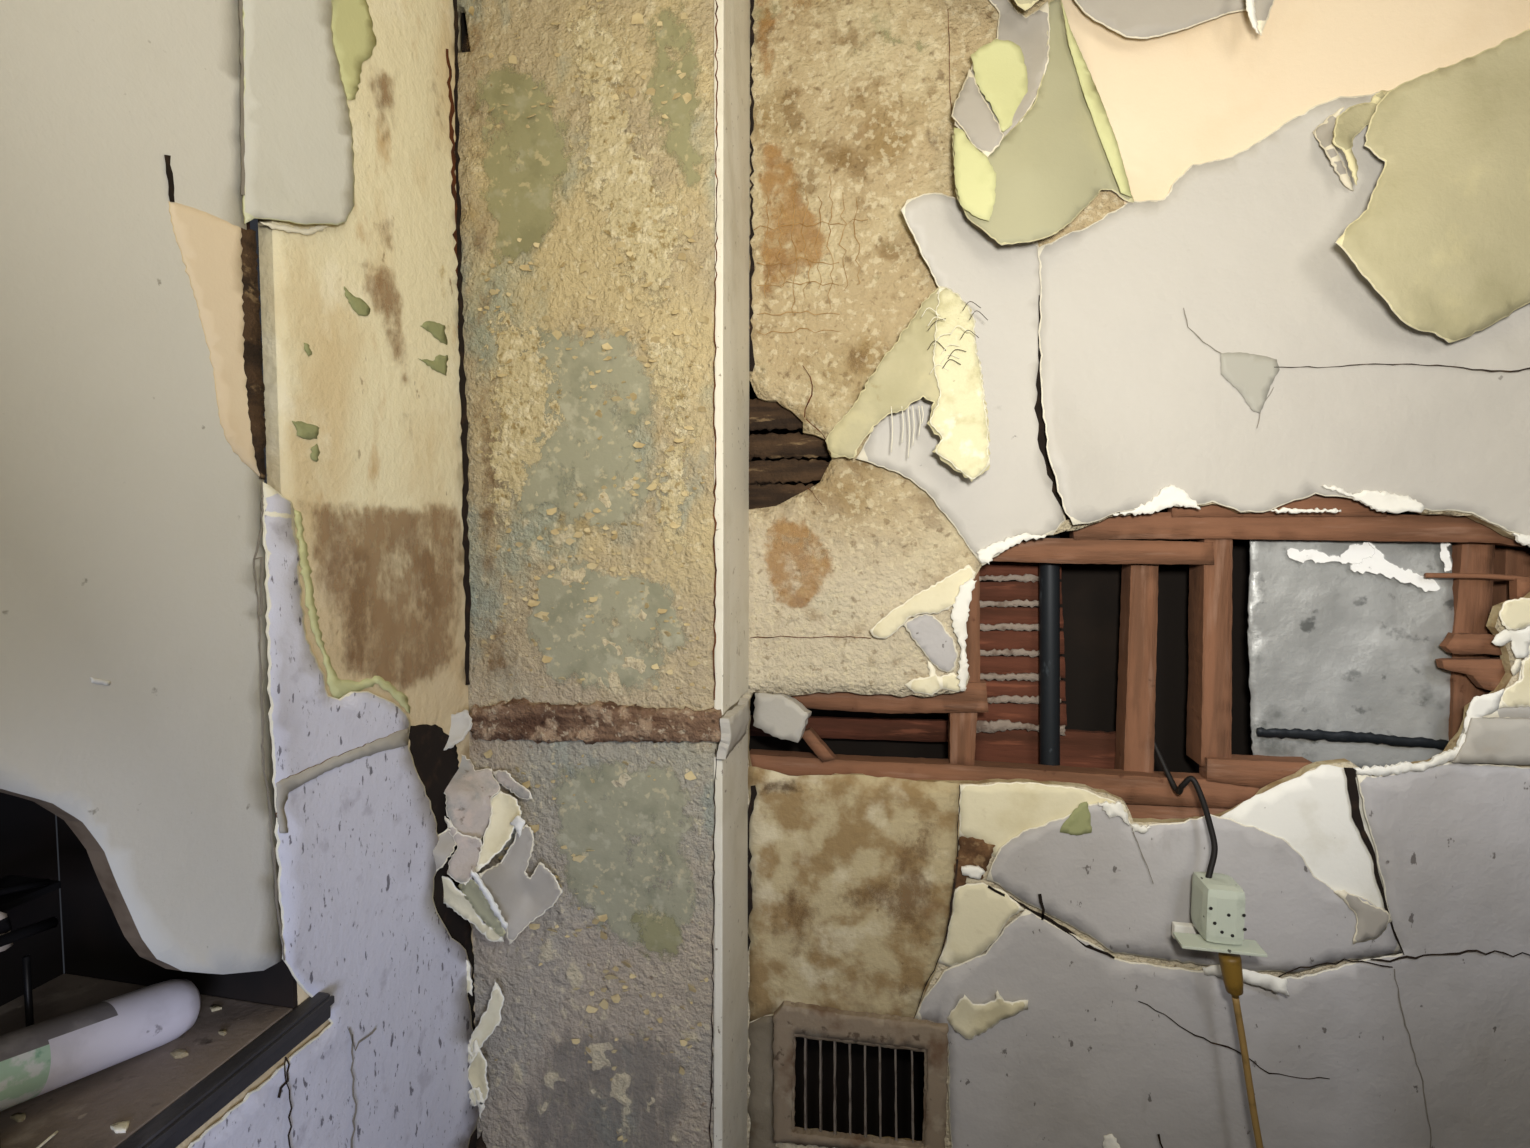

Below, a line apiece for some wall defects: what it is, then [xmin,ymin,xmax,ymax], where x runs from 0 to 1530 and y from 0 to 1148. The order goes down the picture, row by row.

peeling [241,0,377,235]
peeling [749,0,1530,755]
crack [1183,308,1221,354]
crack [1257,363,1530,428]
water stain [315,507,460,688]
peeling [188,482,608,1148]
spalling [749,692,948,759]
spalling [1154,564,1199,773]
peeling [573,962,663,1081]
spalling [794,1037,924,1141]
crack [1278,767,1530,1148]